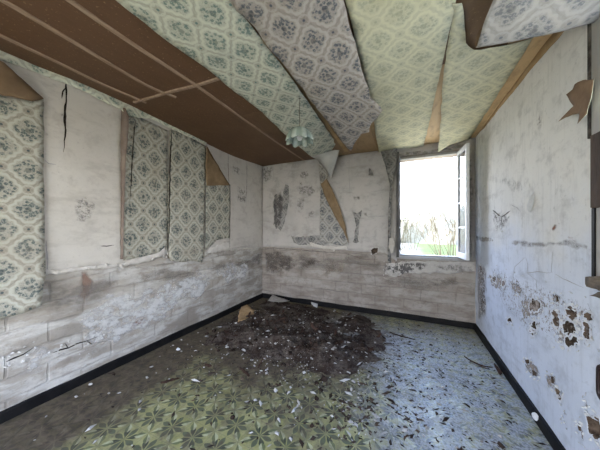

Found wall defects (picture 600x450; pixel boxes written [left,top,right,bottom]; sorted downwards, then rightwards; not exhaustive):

crack [60,84,68,152]
peeling [205,145,230,186]
flaking render [204,241,232,256]
water stain [267,252,291,271]
peeling [383,261,432,276]
water stain [82,275,208,342]
flaking render [473,264,594,352]
crack [53,336,98,353]
peeling [522,357,567,430]
flaking render [574,392,600,448]